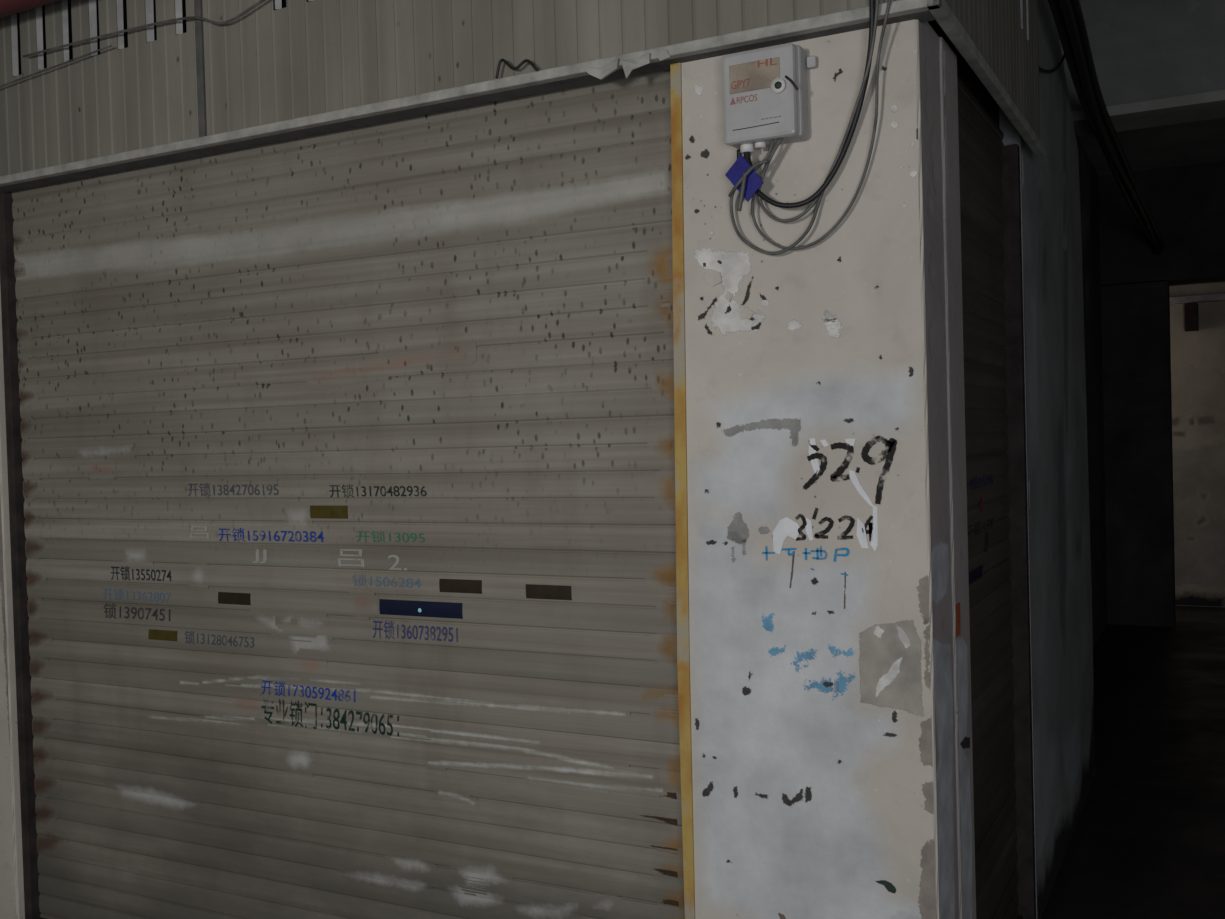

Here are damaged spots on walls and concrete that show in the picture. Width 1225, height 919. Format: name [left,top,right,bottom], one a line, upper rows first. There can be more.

spalling [694,231,779,336]
leakage [724,418,801,446]
leakage [727,512,769,562]